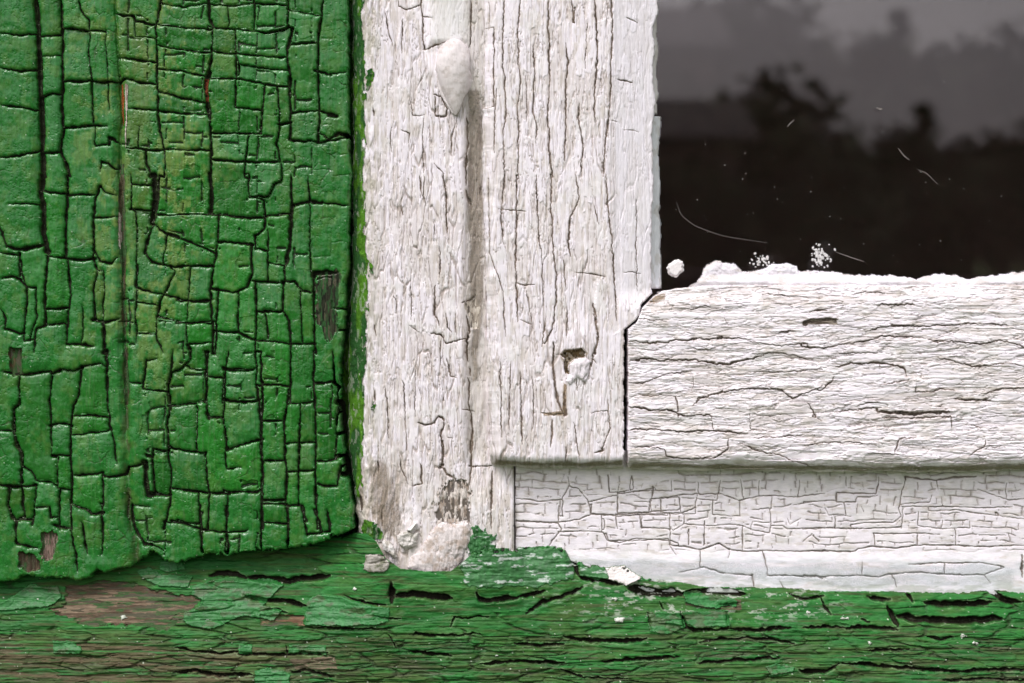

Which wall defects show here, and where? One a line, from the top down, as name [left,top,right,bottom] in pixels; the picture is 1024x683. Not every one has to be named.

crack [0,0,383,571]
peeling [314,268,342,342]
crack [373,0,1024,587]
peeling [8,347,23,377]
peeling [432,475,473,525]
peeling [363,531,419,572]
peeling [0,532,390,631]
peeling [605,566,641,586]
peeling [647,590,742,634]
peeling [52,640,82,655]
peeling [254,644,338,683]
peeling [765,663,795,675]